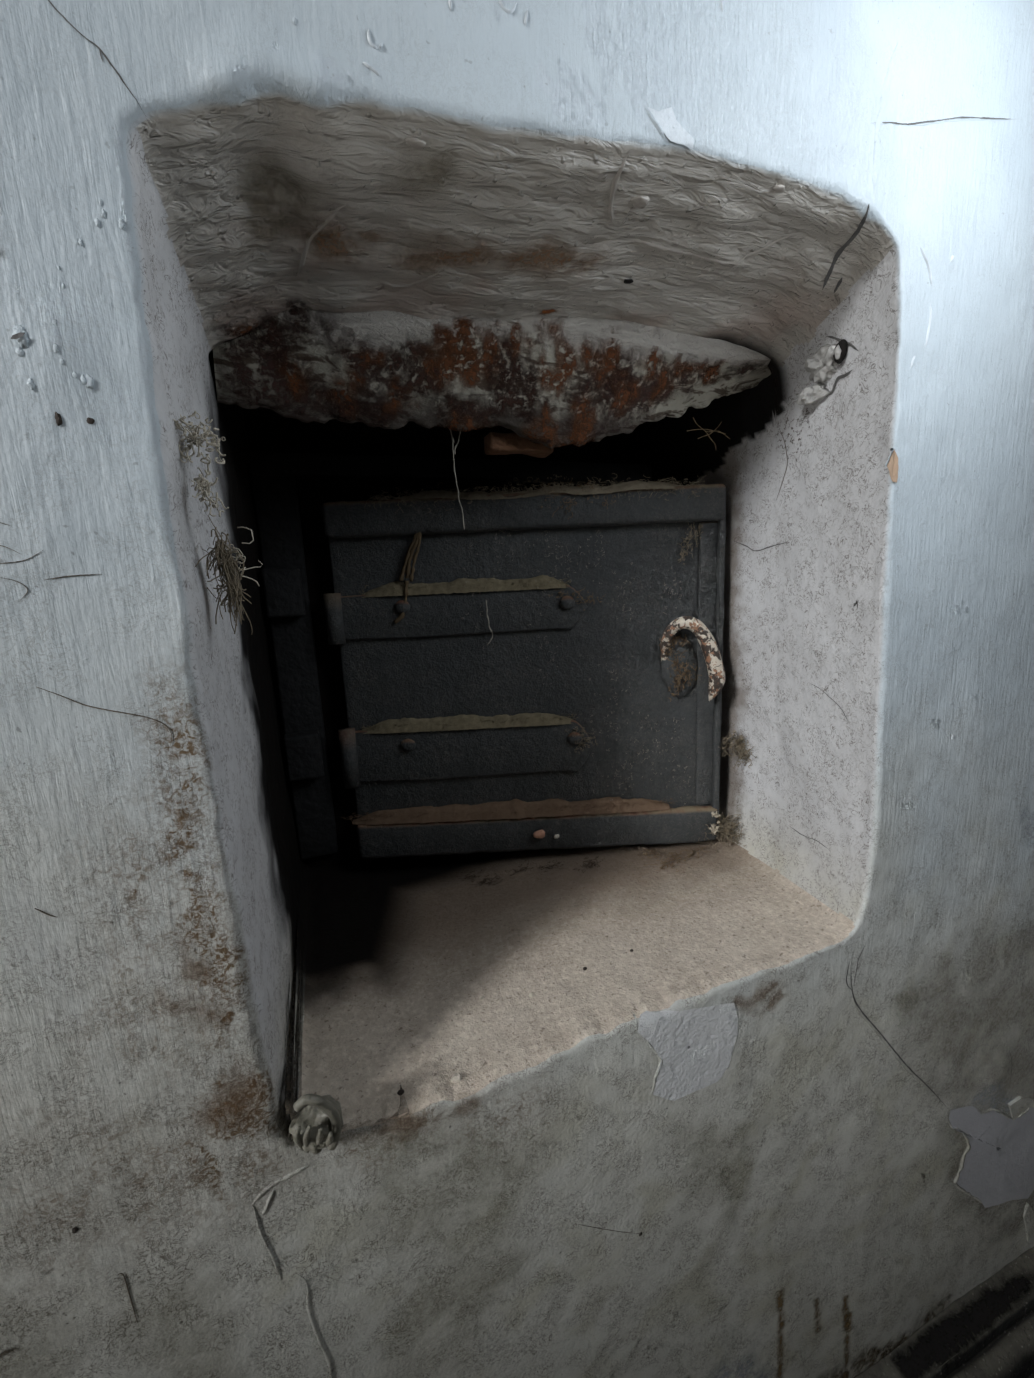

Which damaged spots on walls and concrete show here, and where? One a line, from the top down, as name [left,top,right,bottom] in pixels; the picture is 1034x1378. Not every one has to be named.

crack [882,116,1006,126]
crack [822,205,869,293]
corrosion [327,309,723,447]
peeling [633,1003,739,1101]
peeling [946,1096,1034,1242]
leakage [831,1295,951,1378]